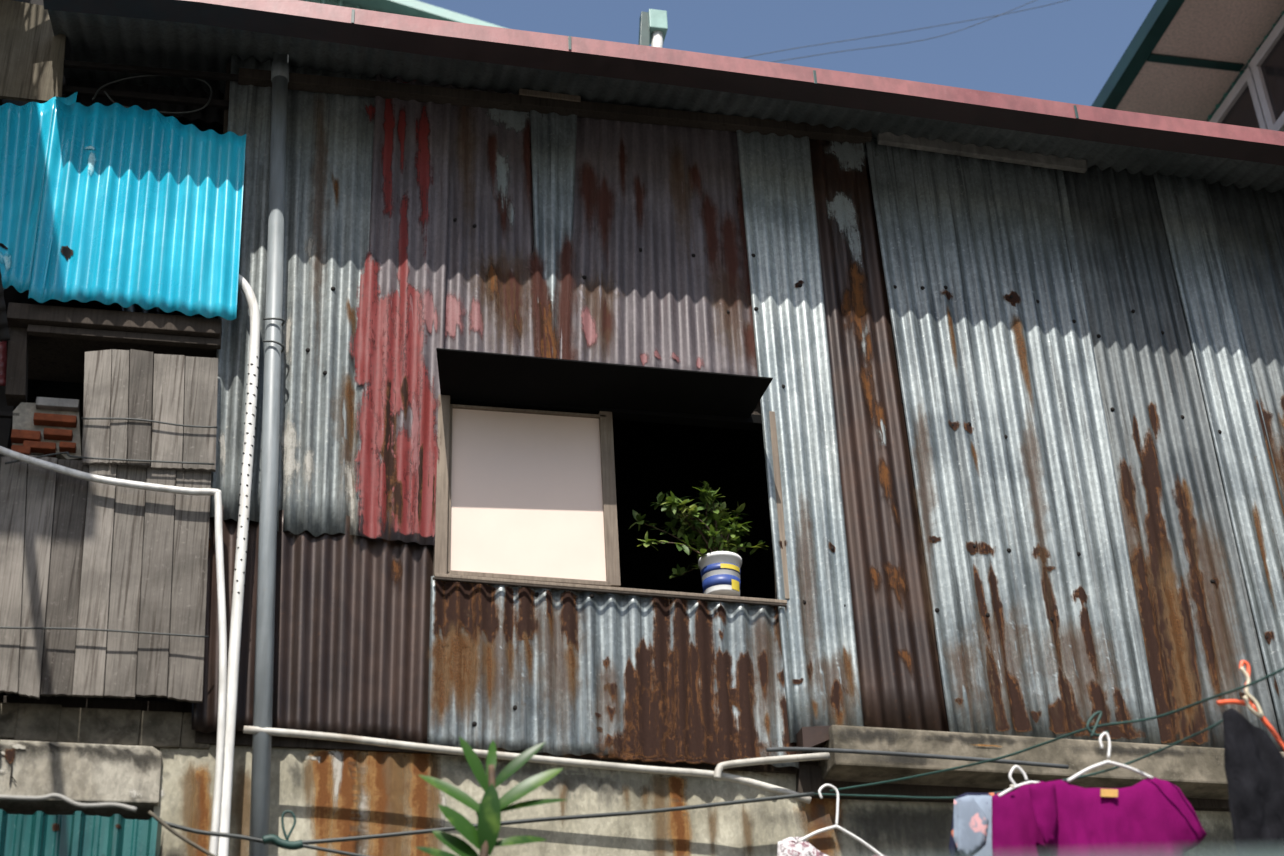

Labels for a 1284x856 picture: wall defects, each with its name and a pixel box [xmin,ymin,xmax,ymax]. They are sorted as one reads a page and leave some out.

peeling [349,98,483,538]
rust [485,236,578,360]
rust [602,301,613,349]
rust [689,164,756,360]
rust [1256,395,1284,515]
rust [966,403,1221,747]
rust [1253,506,1284,604]
rust [431,580,579,720]
rust [595,597,813,856]
rust [812,647,854,725]
rust [305,750,440,856]
rust [801,798,842,856]